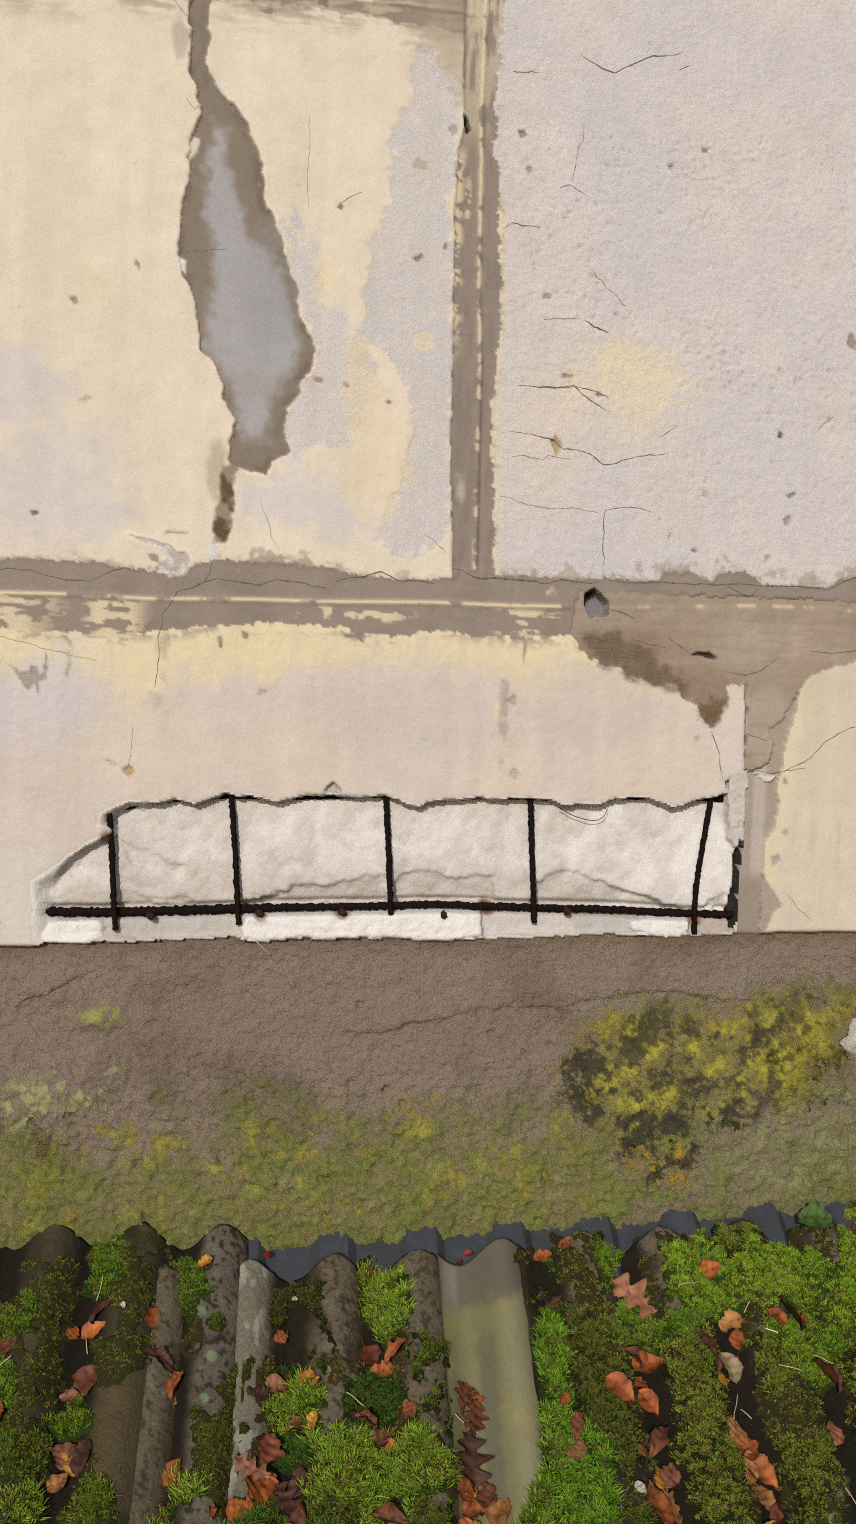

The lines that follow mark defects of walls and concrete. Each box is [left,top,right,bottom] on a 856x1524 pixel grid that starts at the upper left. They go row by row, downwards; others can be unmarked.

crack [582,53,689,73]
peeling [178,0,463,562]
crack [549,269,624,332]
crack [518,385,608,411]
spalling [32,768,790,947]